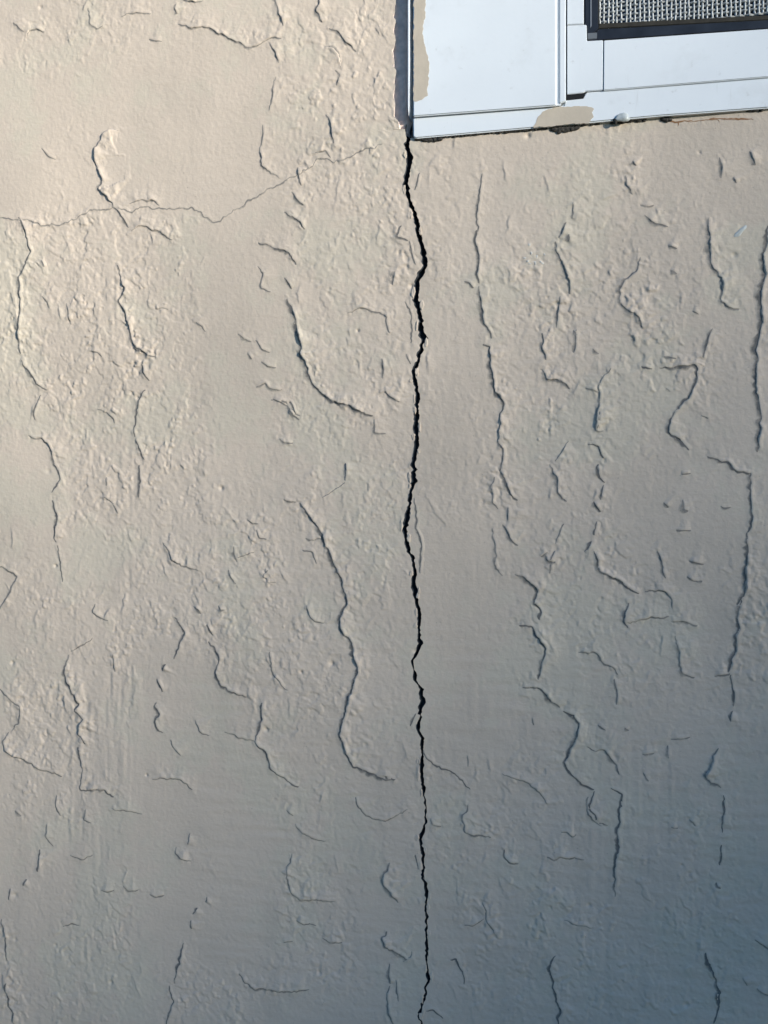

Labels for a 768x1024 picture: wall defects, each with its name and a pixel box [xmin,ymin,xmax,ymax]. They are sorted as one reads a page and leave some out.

crack [0,123,472,1024]
crack [464,174,519,501]
crack [546,956,566,1024]
crack [515,572,626,897]
crack [584,440,640,594]
crack [641,226,768,722]
crack [703,952,725,1024]
crack [714,795,729,889]